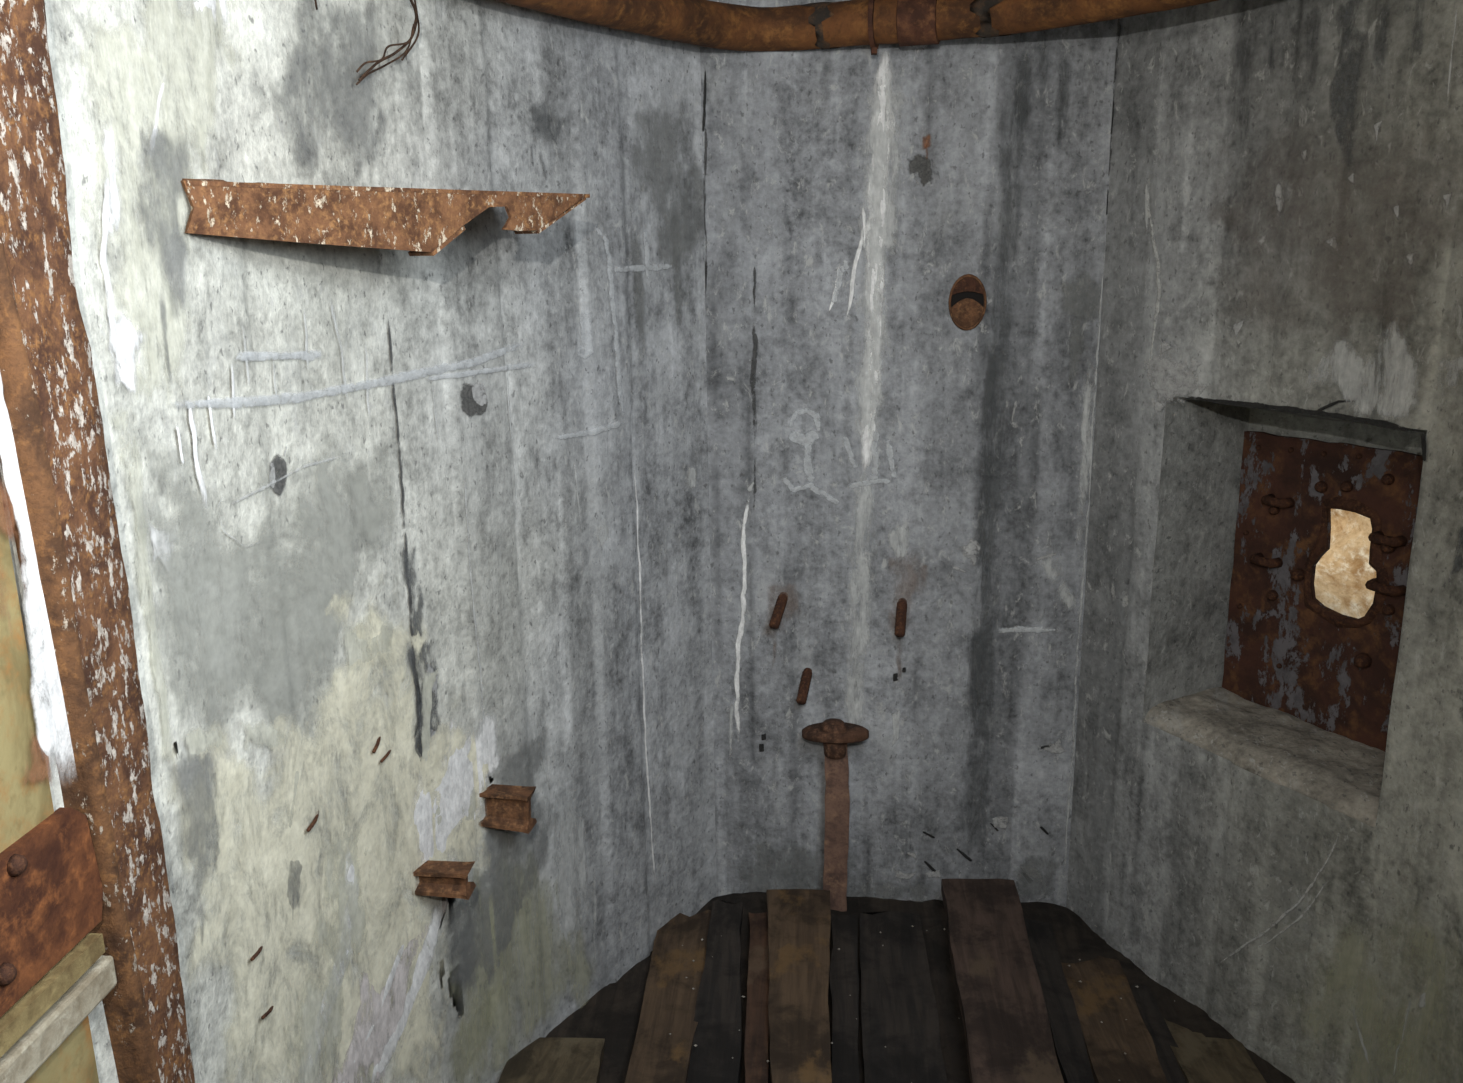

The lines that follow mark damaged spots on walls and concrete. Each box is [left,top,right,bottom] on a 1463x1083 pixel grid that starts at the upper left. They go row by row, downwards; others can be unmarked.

crack [388,321,440,781]